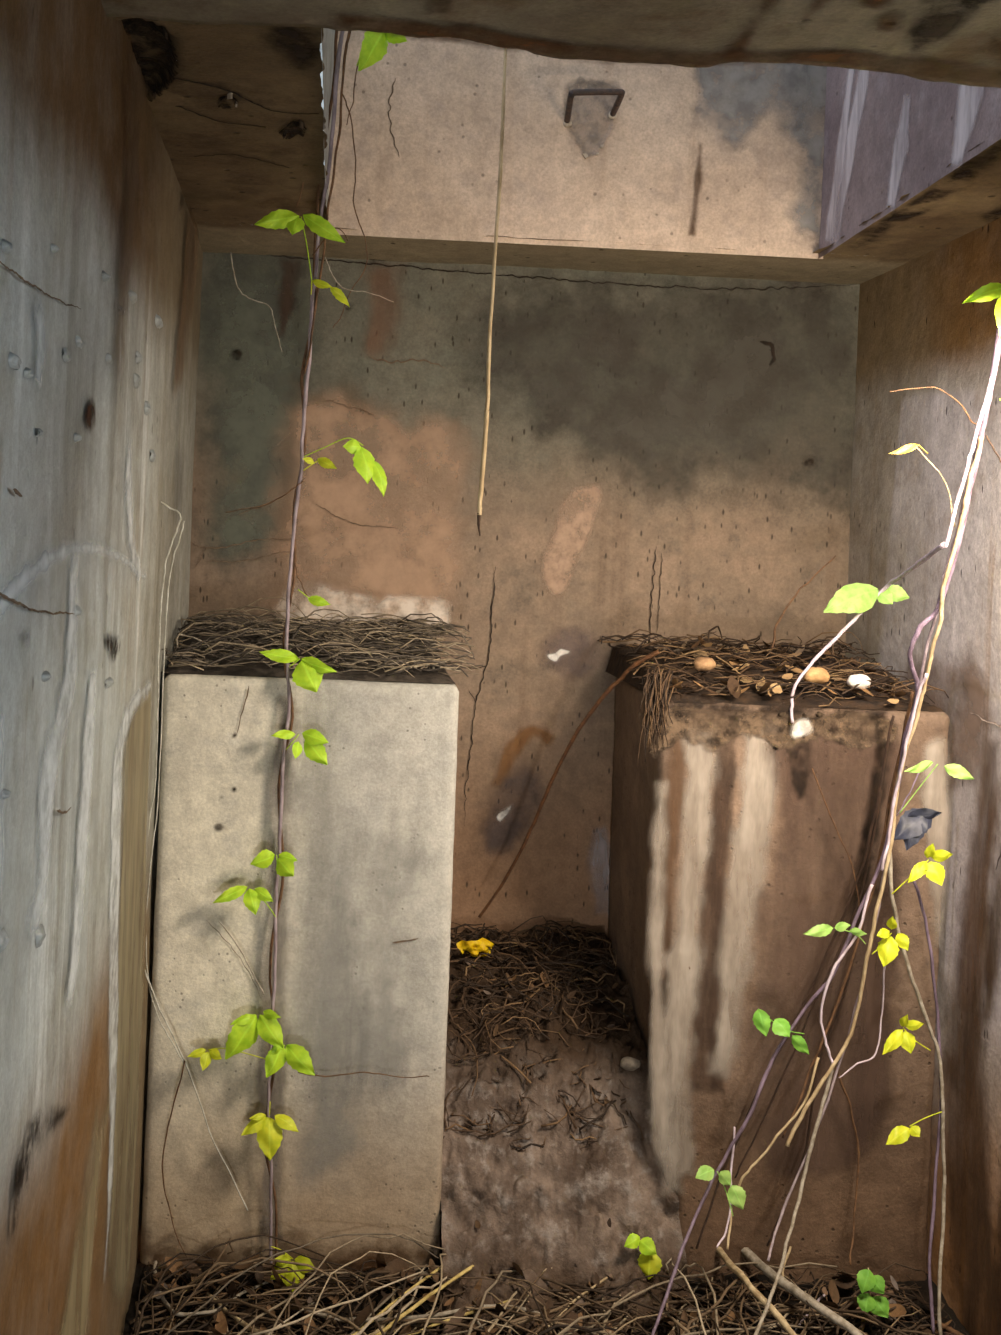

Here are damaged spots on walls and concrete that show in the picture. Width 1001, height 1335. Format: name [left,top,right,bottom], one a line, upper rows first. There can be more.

spalling [121,18,177,102]
leakage [338,16,896,239]
rust [862,0,896,30]
leakage [866,0,1001,237]
crack [0,261,80,309]
crack [0,592,75,615]
crack [464,567,496,820]
leakage [647,697,813,726]
leakage [650,709,899,1190]
rust [12,1109,65,1233]